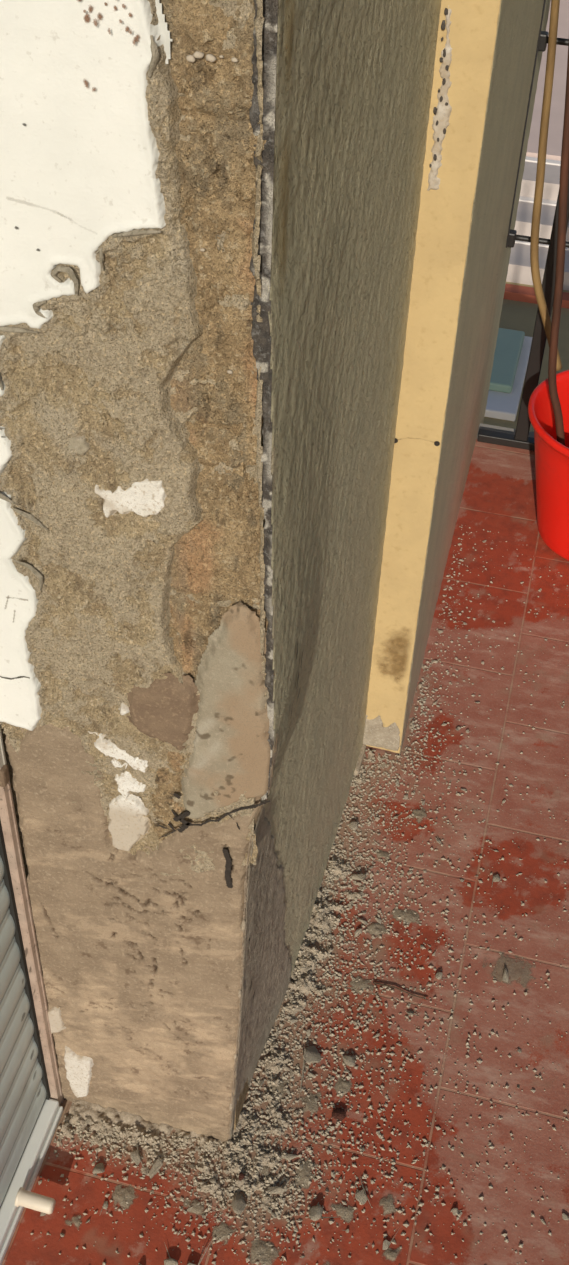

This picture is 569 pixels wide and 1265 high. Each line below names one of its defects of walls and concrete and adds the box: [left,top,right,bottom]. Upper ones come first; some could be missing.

flaking render [0,0,278,871]
crack [158,793,270,888]